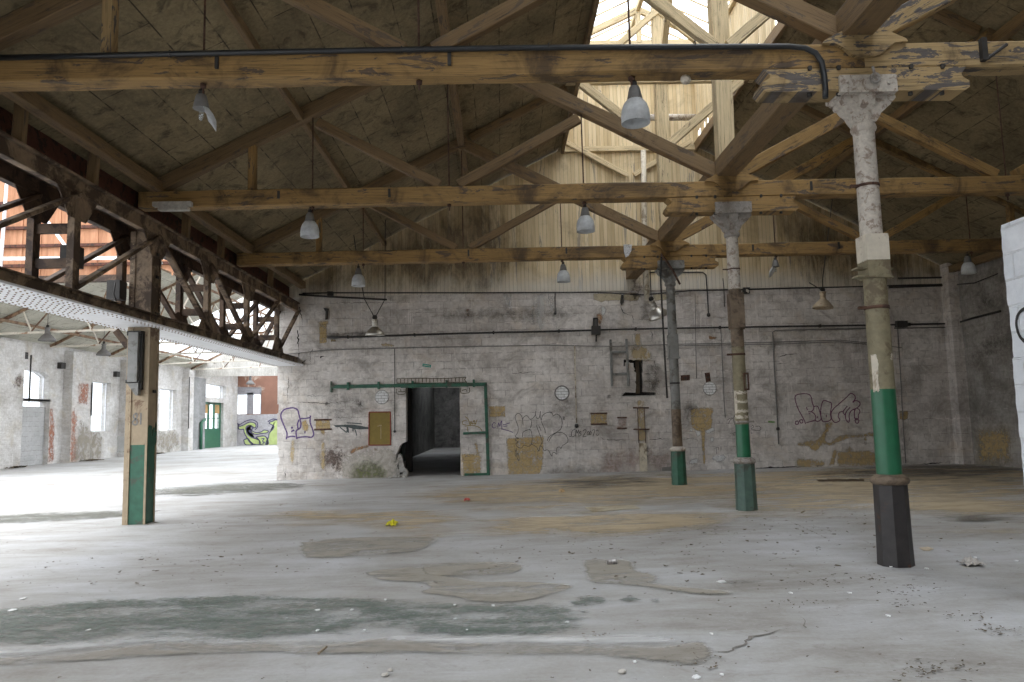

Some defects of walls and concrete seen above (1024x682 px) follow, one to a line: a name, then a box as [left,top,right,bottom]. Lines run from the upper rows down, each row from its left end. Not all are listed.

peeling [871,354,894,392]
flaking render [70,384,89,461]
peeling [734,390,749,419]
crack [711,618,807,652]